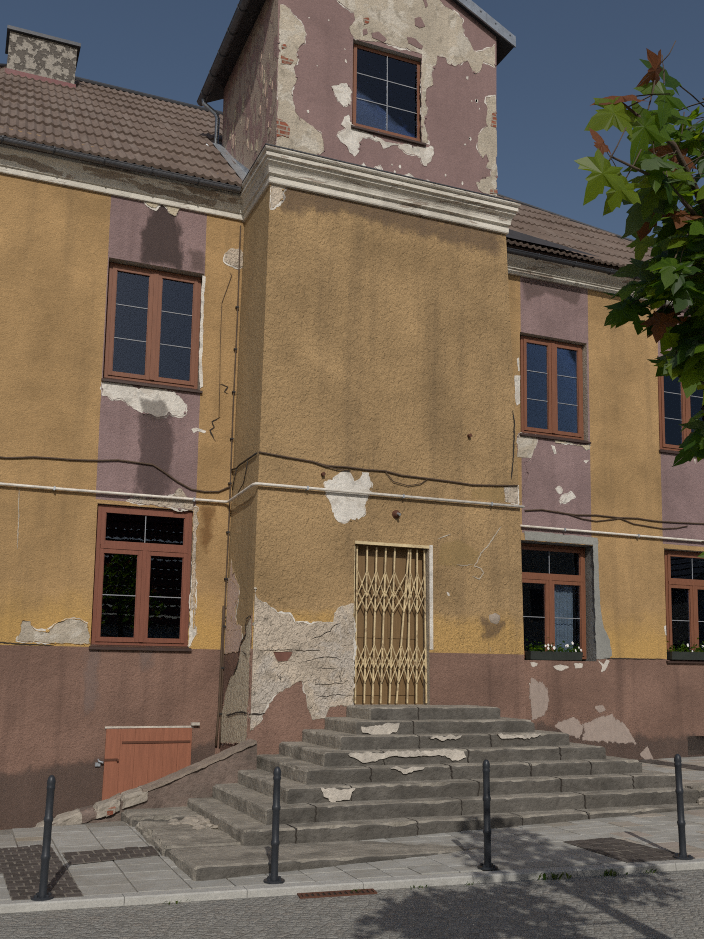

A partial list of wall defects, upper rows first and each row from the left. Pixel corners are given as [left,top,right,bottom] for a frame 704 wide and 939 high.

flaking render [229,4,325,155]
flaking render [331,0,496,178]
flaking render [464,95,498,196]
damp [141,205,182,269]
flaking render [100,381,188,418]
damp [138,412,172,495]
flaking render [324,471,373,524]
flaking render [221,560,357,745]
crack [307,623,343,697]
crack [226,709,264,717]
spalling [348,734,466,774]
flaking render [555,705,653,760]